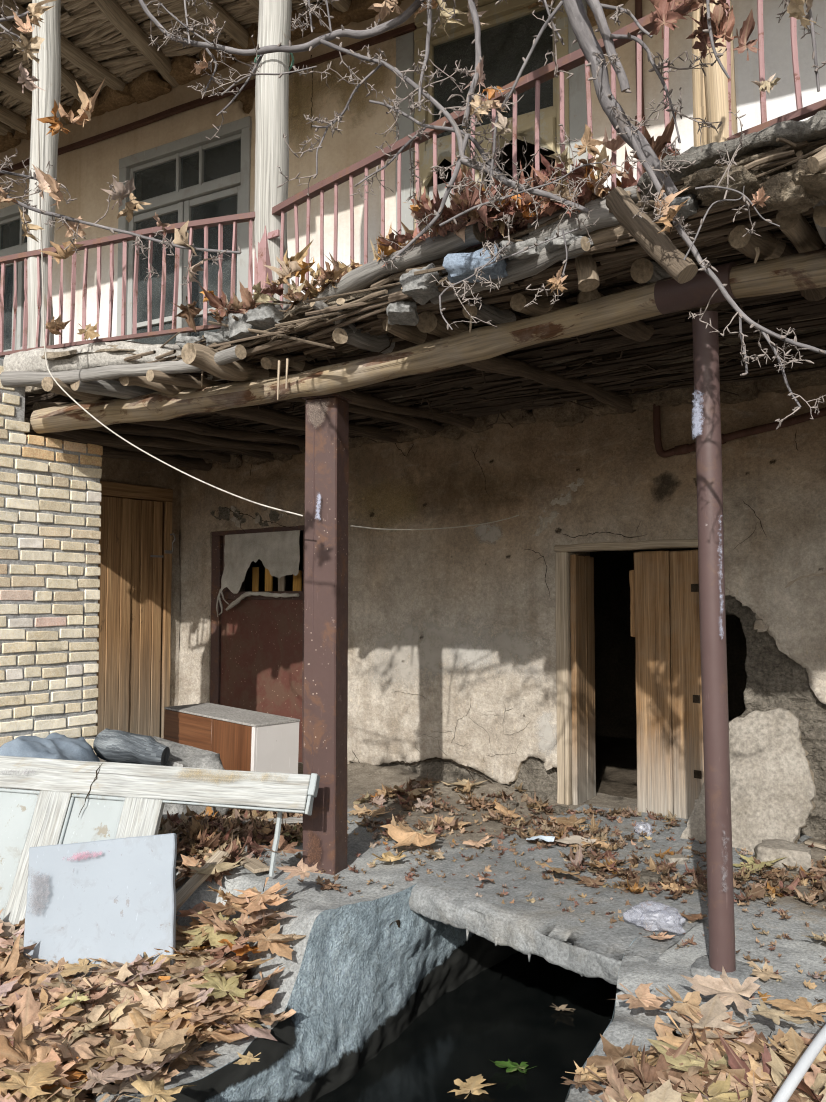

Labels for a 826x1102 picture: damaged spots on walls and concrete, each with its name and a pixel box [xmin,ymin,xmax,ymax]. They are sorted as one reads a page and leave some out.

flaking render [382,756,557,801]
flaking render [725,587,826,839]